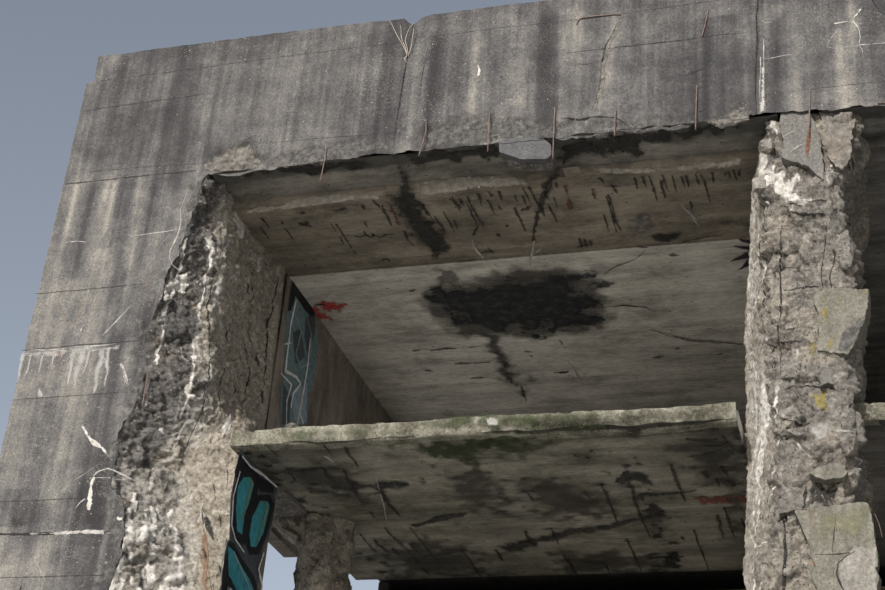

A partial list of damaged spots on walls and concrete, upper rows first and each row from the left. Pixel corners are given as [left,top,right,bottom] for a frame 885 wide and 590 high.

crack [568,0,791,127]
spalling [204,140,392,183]
crack [529,147,581,267]
spalling [779,89,856,181]
damp [18,344,119,393]
spalling [160,304,201,346]
damp [154,144,558,457]
damp [356,152,815,590]
crack [758,197,835,389]
spalling [814,287,871,360]
damp [244,444,409,518]
spalling [778,463,882,590]